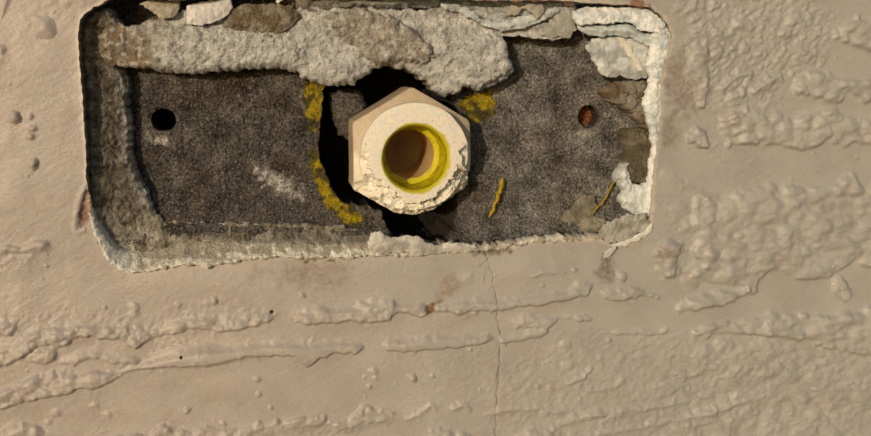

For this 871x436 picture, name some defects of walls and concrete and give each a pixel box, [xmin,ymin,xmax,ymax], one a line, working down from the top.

spalling [79,0,670,274]